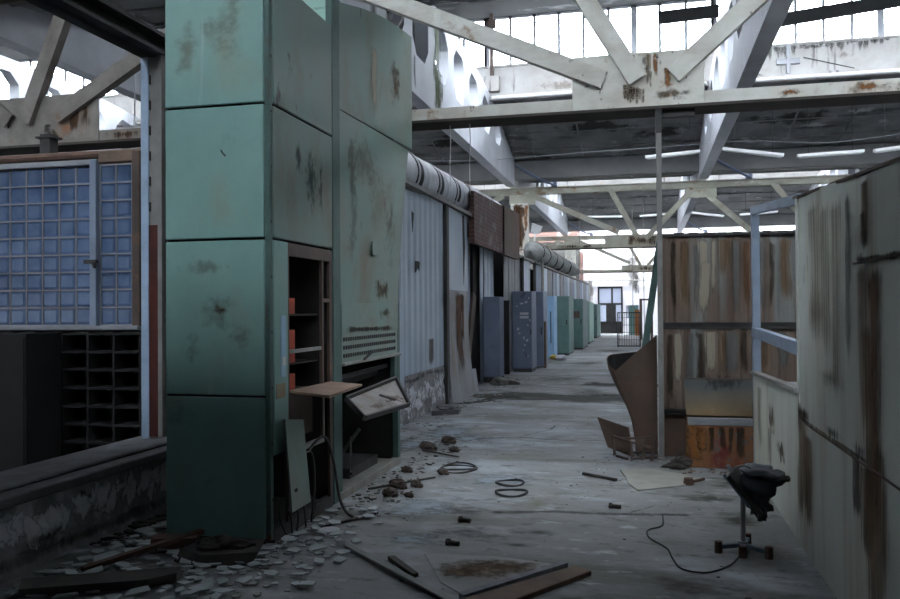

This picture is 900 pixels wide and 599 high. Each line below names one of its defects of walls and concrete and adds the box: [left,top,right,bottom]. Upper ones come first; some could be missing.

corrosion [623,53,688,103]
corrosion [670,241,699,308]
corrosion [712,238,792,311]
peeling [405,369,445,422]
corrosion [456,294,465,369]
corrosion [667,332,707,398]
corrosion [720,331,748,372]
corrosion [793,156,900,599]
peeling [0,462,167,550]